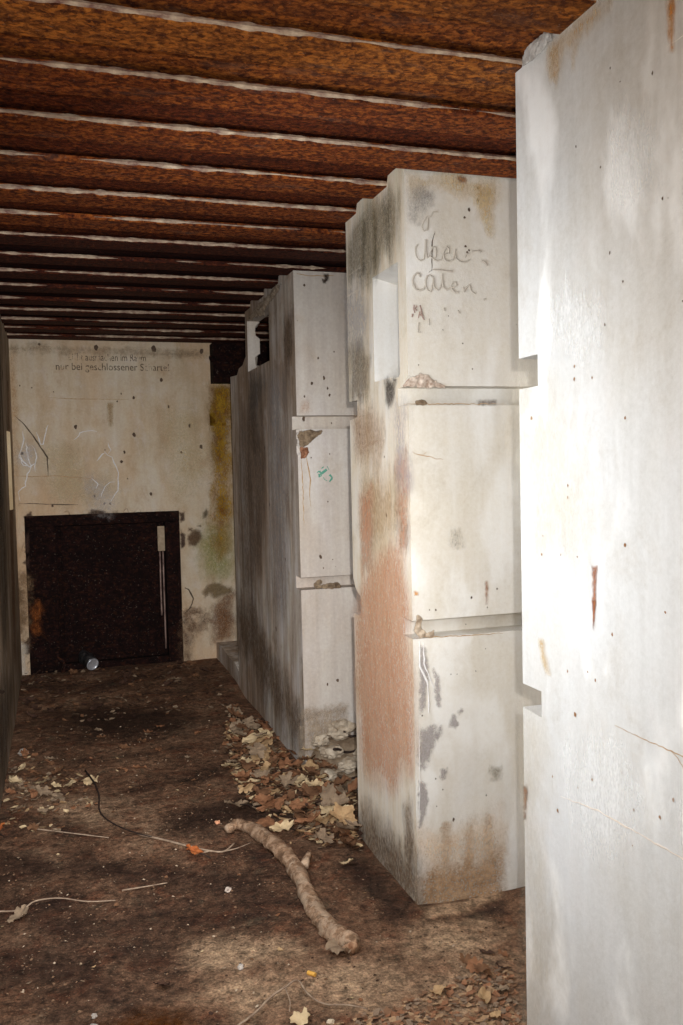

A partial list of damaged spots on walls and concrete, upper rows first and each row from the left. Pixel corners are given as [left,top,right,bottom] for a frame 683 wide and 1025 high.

leakage [84,159,387,186]
leakage [0,184,395,280]
leakage [0,263,329,341]
leakage [386,381,395,406]
spalling [403,364,445,406]
spalling [297,416,332,459]
leakage [204,380,263,585]
leakage [182,594,345,751]
peeling [414,609,440,716]
peeling [420,710,463,767]
peeling [418,770,447,822]
leakage [362,727,503,908]